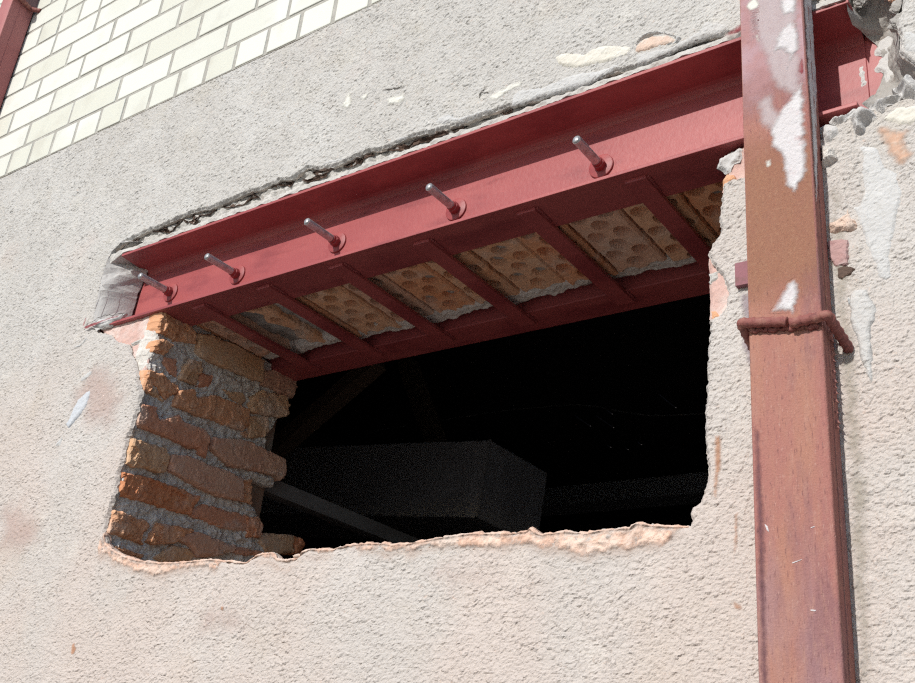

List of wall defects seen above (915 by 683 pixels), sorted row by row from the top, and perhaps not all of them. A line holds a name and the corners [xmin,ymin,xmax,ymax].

rust [740,0,782,108]
rust [793,0,806,84]
spalling [818,0,915,109]
peeling [884,106,915,126]
crack [136,126,464,241]
rust [745,150,817,283]
spalling [709,259,729,320]
spalling [95,314,154,358]
spalling [98,522,689,576]